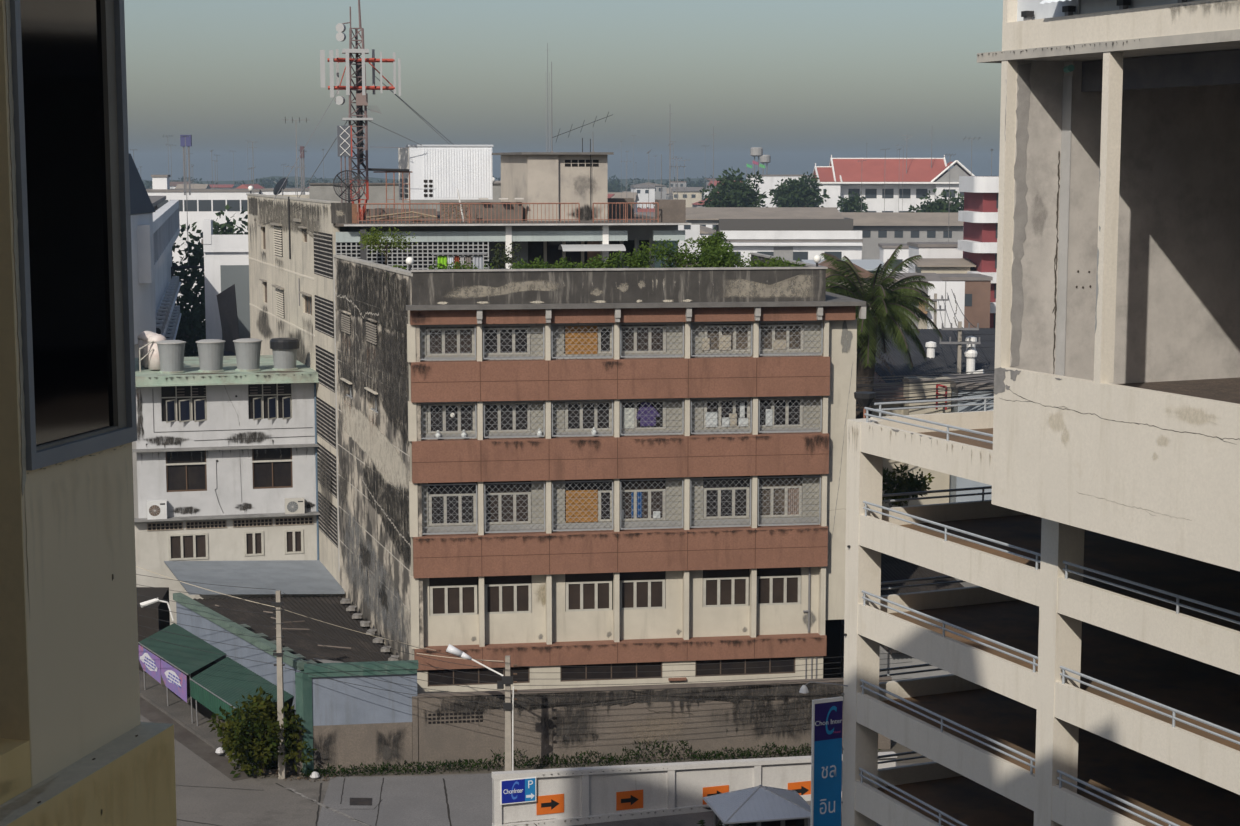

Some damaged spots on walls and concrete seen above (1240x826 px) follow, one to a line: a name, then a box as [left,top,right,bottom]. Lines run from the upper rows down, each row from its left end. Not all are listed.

damp [336,261,426,452]
crack [1052,151,1060,374]
crack [1000,389,1239,444]
damp [425,682,844,745]